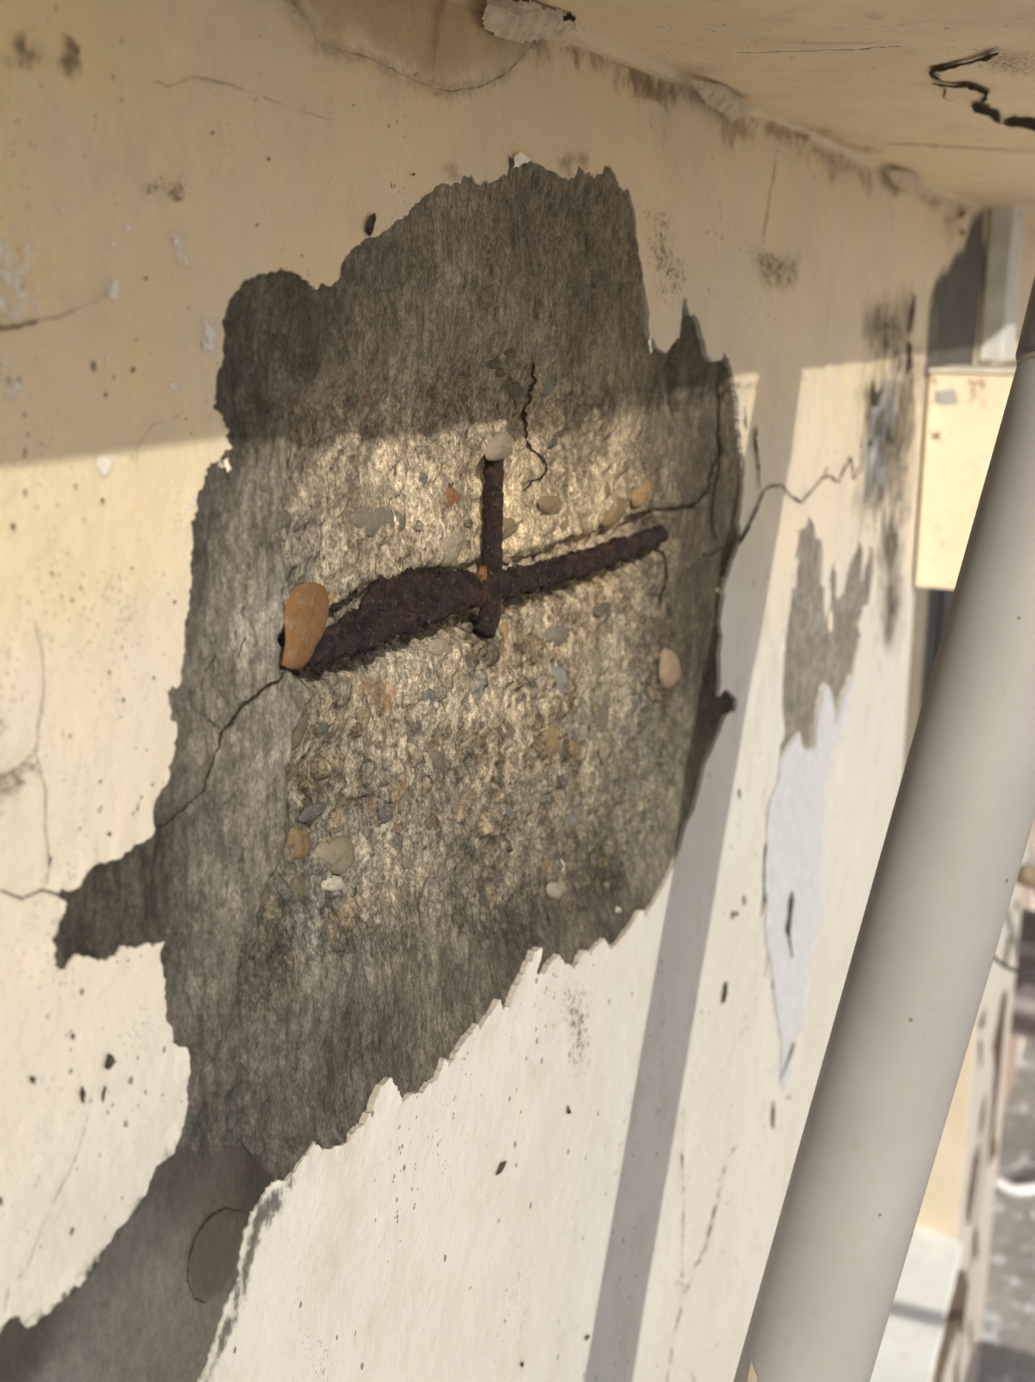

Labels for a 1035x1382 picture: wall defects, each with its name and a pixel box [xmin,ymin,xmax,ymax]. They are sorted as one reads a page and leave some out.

crack [887,52,1035,153]
crack [0,292,109,330]
crack [522,362,548,508]
crack [655,381,861,544]
corrosion [279,455,669,672]
crack [652,549,668,604]
crack [157,636,284,827]
spalling [0,152,741,1382]
peeling [732,519,872,1129]